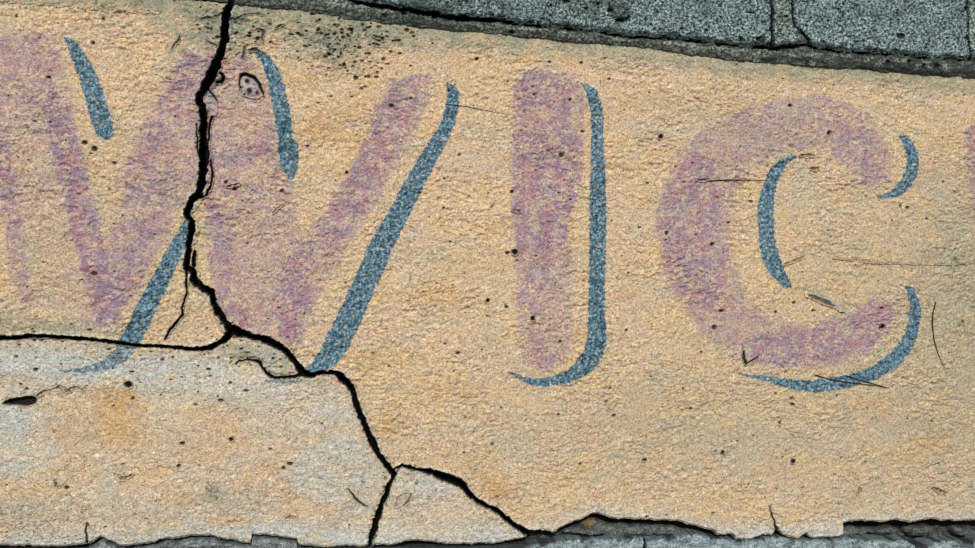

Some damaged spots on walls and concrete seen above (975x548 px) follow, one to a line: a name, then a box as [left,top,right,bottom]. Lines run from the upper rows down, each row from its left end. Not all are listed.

crack [427,0,975,62]
crack [0,0,556,546]
spalling [2,384,84,407]
peeling [347,487,369,508]
peeling [394,493,412,508]
spalling [526,513,731,539]
spalling [843,518,975,539]
spalling [88,534,301,548]